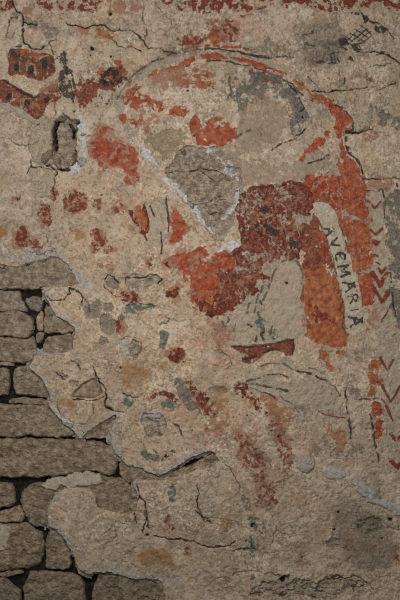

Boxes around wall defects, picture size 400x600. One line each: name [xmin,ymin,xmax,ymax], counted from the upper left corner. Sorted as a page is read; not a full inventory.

crack [8,1,54,55]
crack [66,18,177,54]
flaking render [52,106,244,241]
flaking render [0,226,218,600]
crack [108,487,255,551]